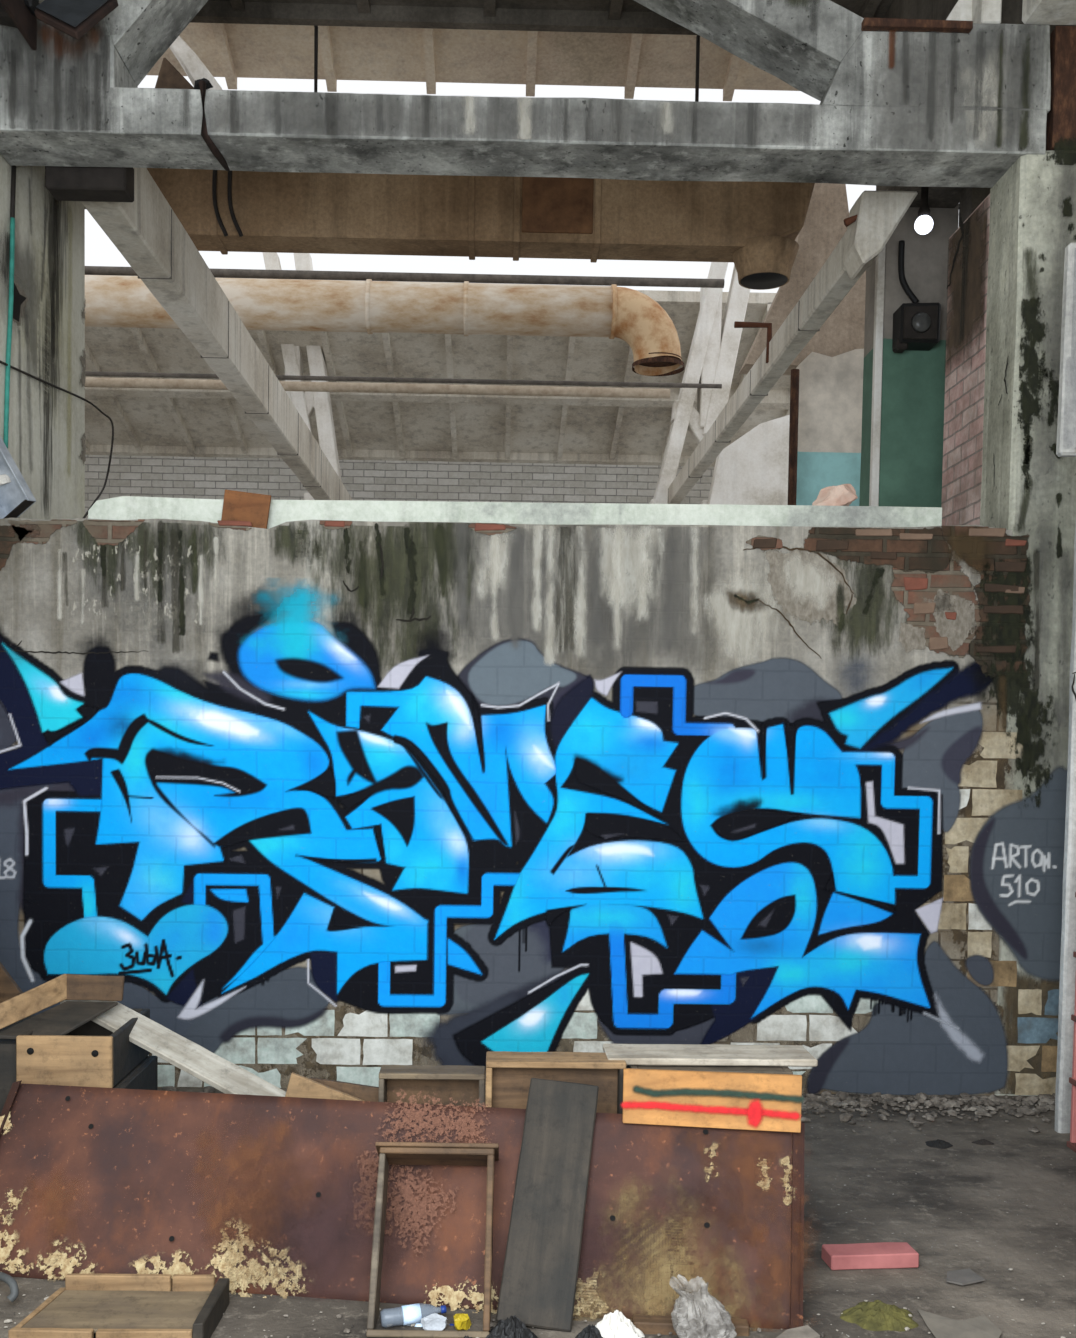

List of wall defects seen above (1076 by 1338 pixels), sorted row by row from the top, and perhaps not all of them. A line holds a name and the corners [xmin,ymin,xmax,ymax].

rust [861,17,973,34]
flaking render [0,519,145,571]
damp [59,521,217,652]
damp [343,523,386,607]
damp [404,527,418,615]
damp [435,526,696,661]
flaking render [746,526,1035,685]
peeling [917,732,1060,1095]